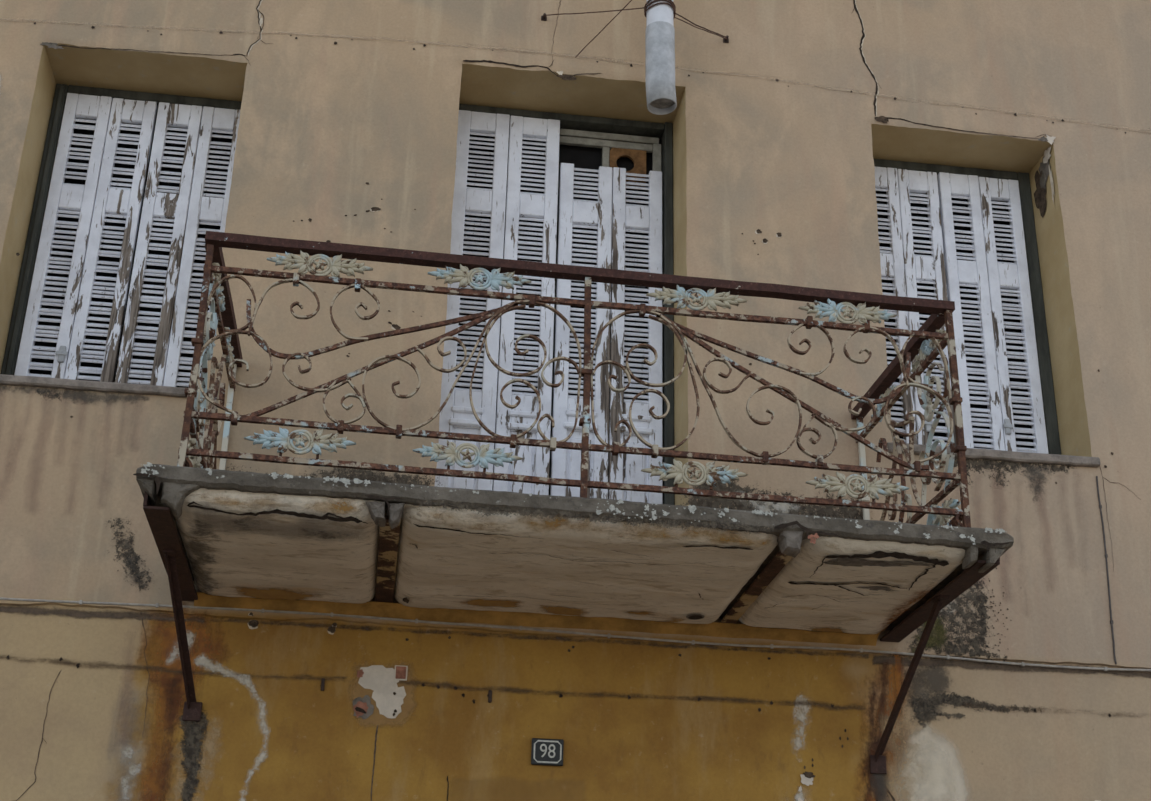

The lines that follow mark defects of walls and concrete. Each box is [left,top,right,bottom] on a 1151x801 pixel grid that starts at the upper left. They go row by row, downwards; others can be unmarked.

crack [57,0,269,64]
crack [851,0,1055,141]
crack [133,473,161,494]
crack [187,495,753,569]
crack [768,521,949,610]
water stain [44,656,268,801]
rust [140,608,224,801]
spalling [352,665,416,726]
rust [860,654,906,801]
water stain [872,567,1042,801]